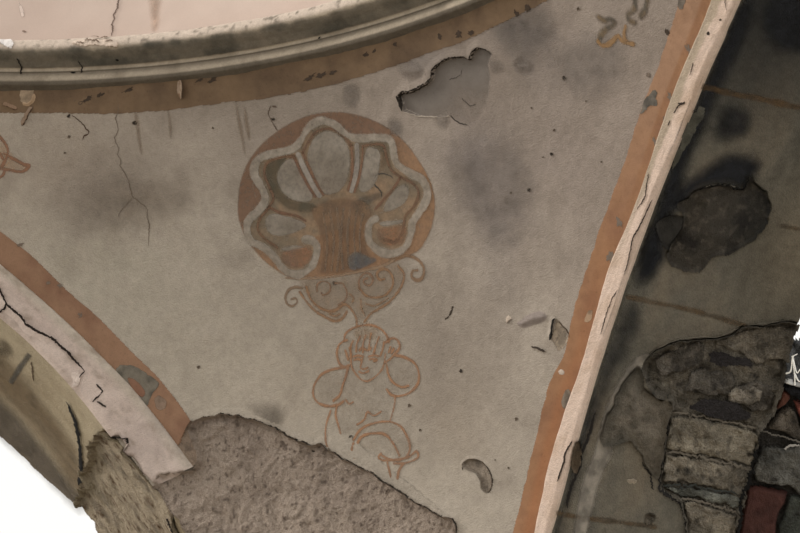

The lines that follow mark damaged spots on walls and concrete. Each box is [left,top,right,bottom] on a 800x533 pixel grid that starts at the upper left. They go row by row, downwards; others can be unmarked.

peeling [392,30,492,125]
crack [114,102,150,245]
crack [601,174,651,332]
spalling [655,176,771,273]
crack [0,289,106,407]
peeling [546,316,569,350]
crack [66,402,83,485]
spalling [73,407,459,533]
spalling [460,455,496,492]
peeling [561,389,570,409]
spalling [571,442,582,474]
spalling [600,319,800,533]